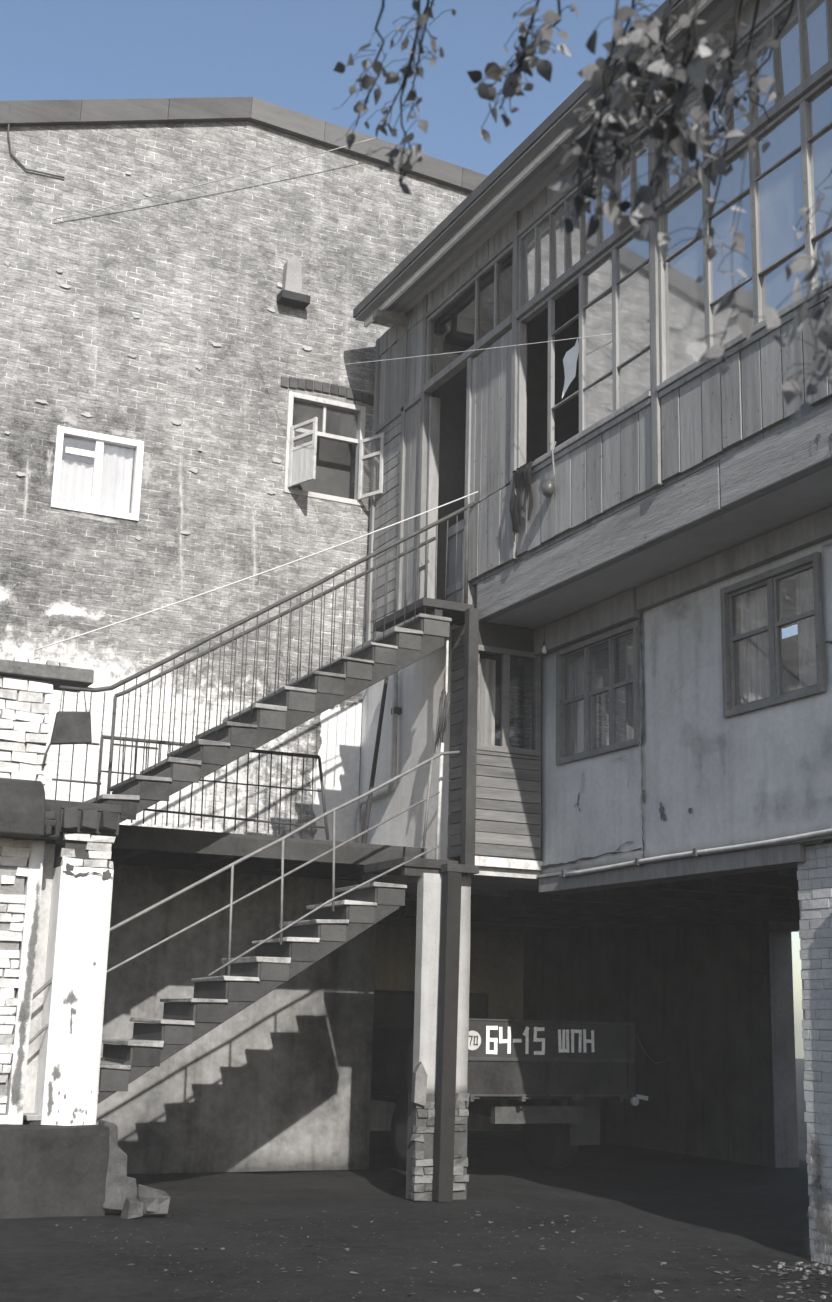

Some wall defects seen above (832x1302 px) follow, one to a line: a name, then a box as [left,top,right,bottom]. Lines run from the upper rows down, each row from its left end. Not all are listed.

peeling [0,600,267,802]
peeling [119,701,362,843]
spalling [63,863,113,880]
water stain [807,1140,832,1263]